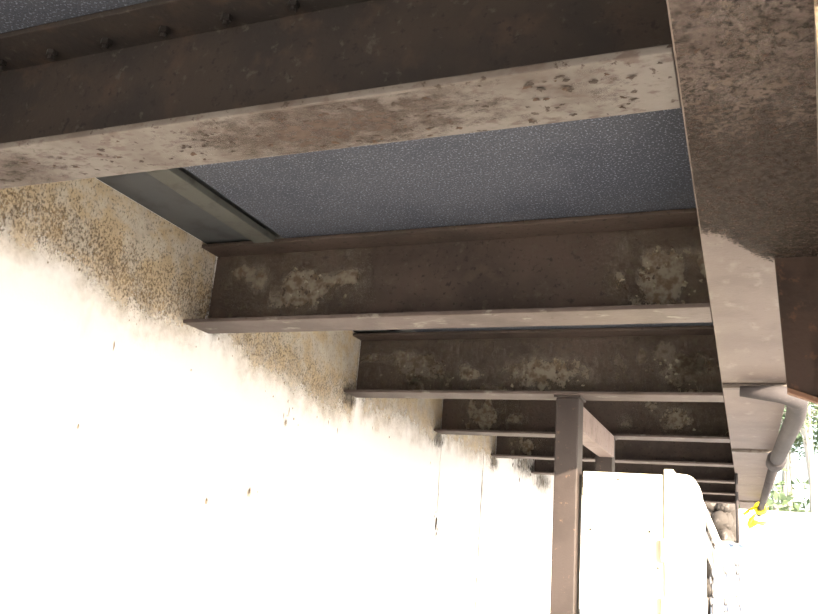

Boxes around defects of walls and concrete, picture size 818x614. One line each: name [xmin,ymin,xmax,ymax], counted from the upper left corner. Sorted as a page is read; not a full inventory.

rust [179,93,498,160]
rust [522,82,564,109]